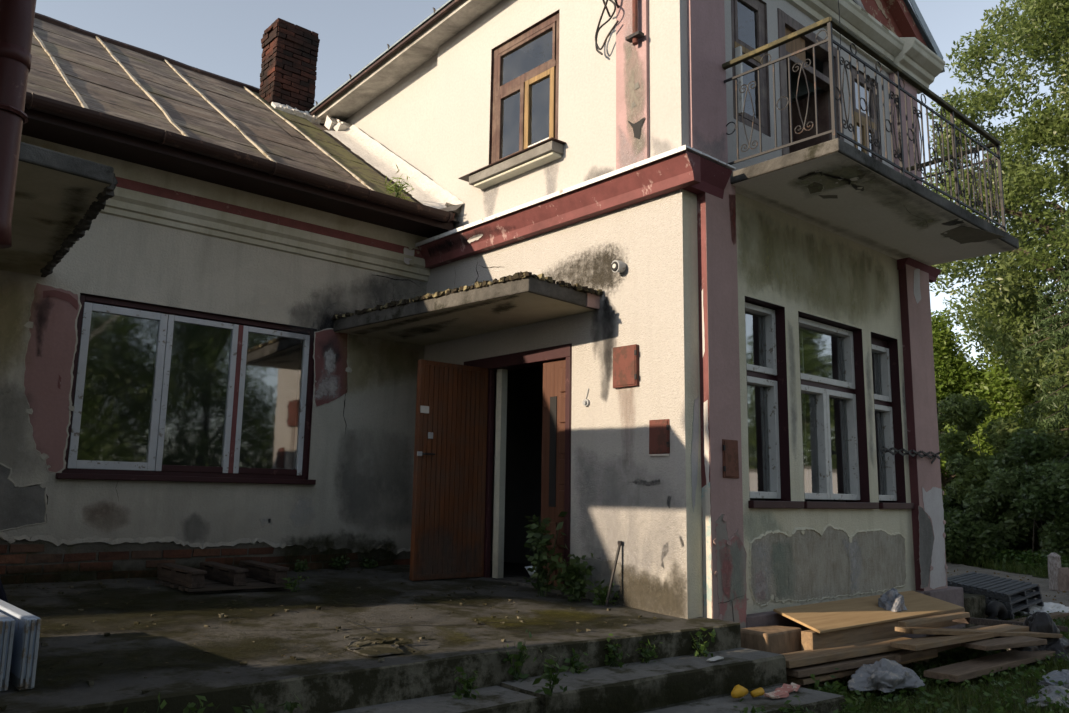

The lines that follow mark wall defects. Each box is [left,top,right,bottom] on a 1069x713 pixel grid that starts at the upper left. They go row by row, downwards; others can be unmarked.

spalling [40,173,118,277]
peeling [313,271,603,407]
water stain [571,254,613,321]
flaking render [0,463,411,585]
flaking render [691,395,948,628]